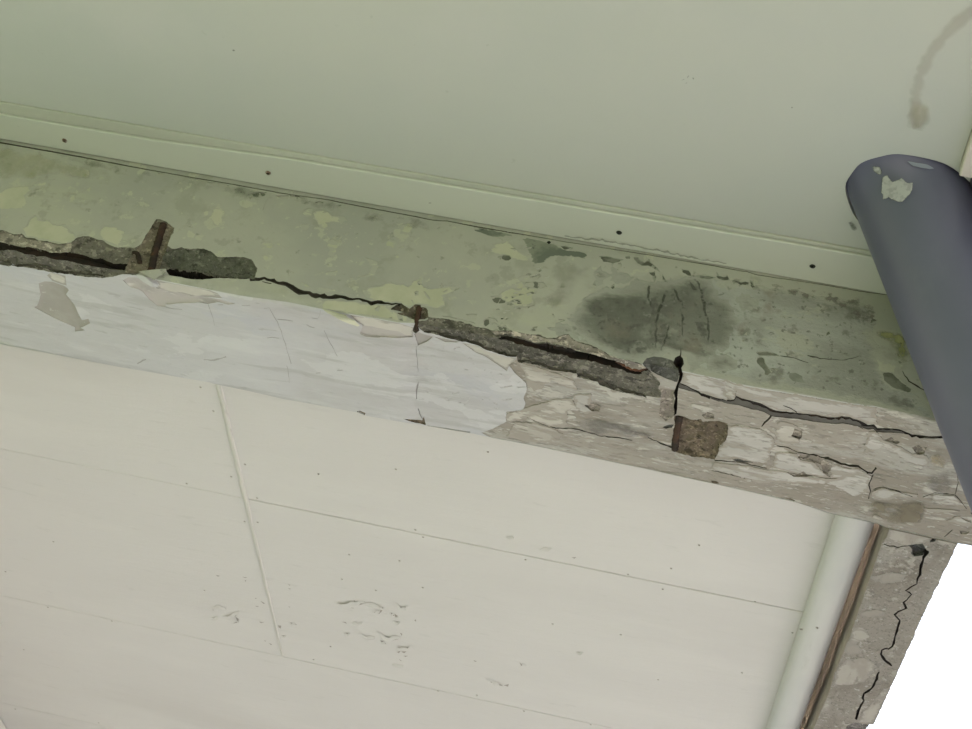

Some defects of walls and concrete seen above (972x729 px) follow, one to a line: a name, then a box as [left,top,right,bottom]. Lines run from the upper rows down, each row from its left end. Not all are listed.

spalling [0,219,257,331]
crack [208,277,400,376]
water stain [474,227,587,266]
water stain [548,256,763,373]
crack [531,419,671,448]
peeling [321,267,972,556]
crack [712,459,763,477]
crack [674,350,942,439]
crack [779,446,972,514]
peeling [833,610,885,685]
crack [855,549,929,720]
peeling [845,688,889,729]